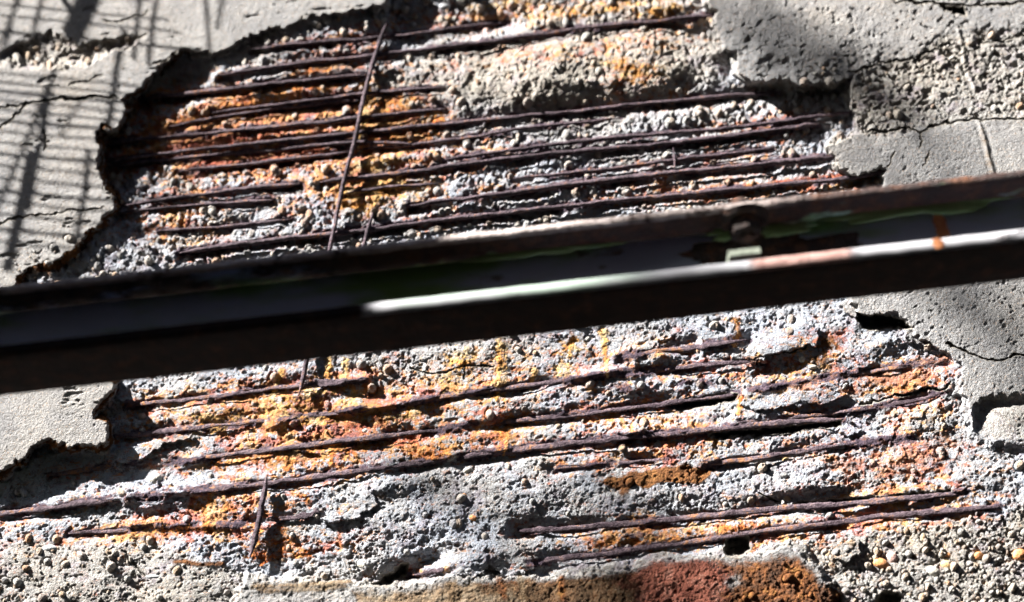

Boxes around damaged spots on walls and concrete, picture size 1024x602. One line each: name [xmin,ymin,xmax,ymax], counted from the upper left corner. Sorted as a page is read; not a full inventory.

crack [848,33,1024,74]
crack [0,73,120,129]
rust [150,63,456,216]
spalling [0,0,1024,285]
rust [679,231,864,266]
crack [945,341,1024,362]
rust [189,356,426,434]
rust [201,443,361,471]
spalling [0,298,1024,602]
rust [602,462,712,496]
rust [832,432,962,483]
rust [476,553,843,602]